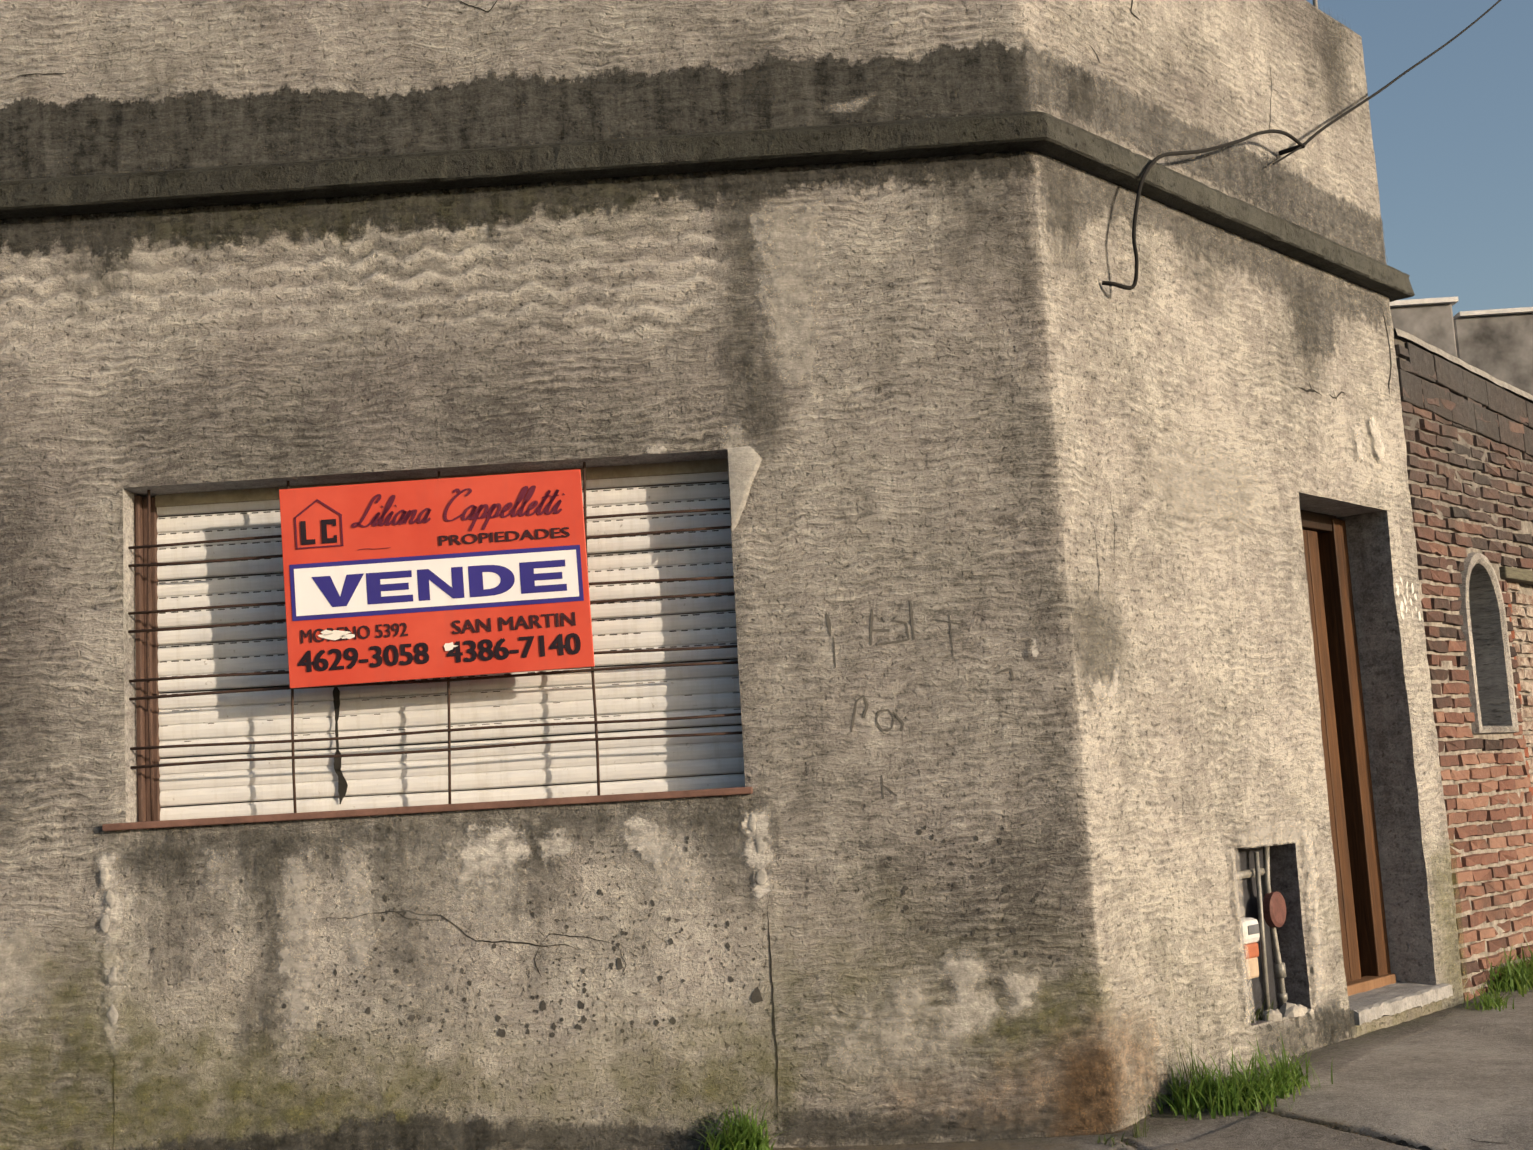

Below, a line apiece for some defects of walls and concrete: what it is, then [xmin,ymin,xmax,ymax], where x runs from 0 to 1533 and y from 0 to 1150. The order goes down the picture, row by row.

water stain [0,40,1387,265]
water stain [0,150,1392,460]
flaking render [742,806,774,899]
crack [314,910,626,977]
water stain [64,1111,722,1150]
water stain [779,1016,1163,1149]